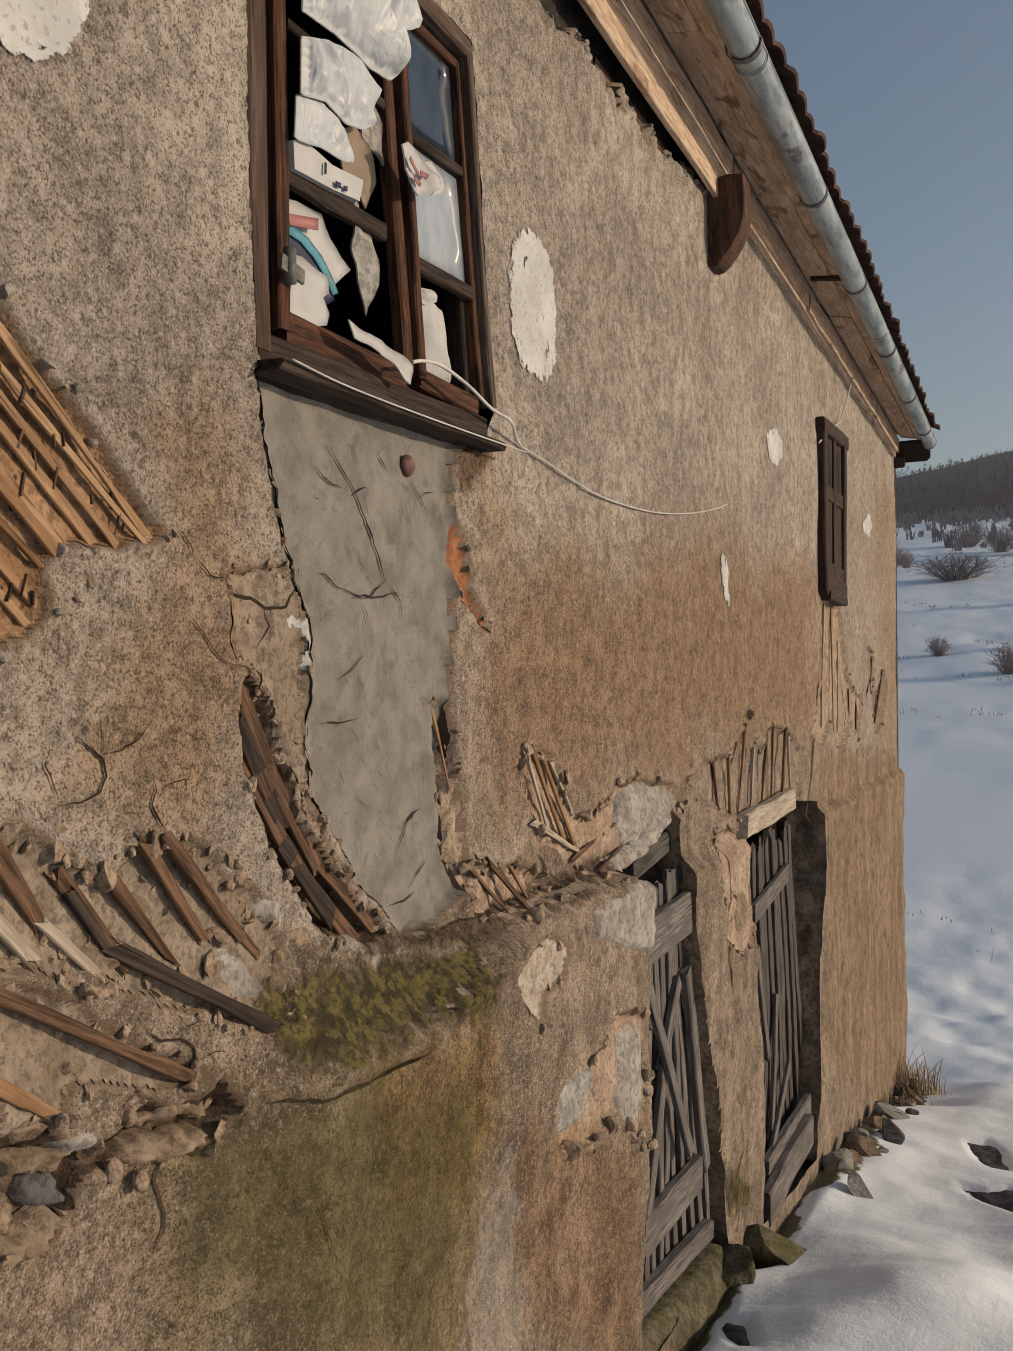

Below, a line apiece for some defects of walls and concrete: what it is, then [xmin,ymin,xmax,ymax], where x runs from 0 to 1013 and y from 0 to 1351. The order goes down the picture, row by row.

flaking render [539,0,709,195]
peeling [37,540,101,559]
crack [173,382,434,680]
flaking render [445,524,493,630]
flaking render [225,537,389,933]
crack [305,707,359,790]
peeling [578,770,664,822]
peeling [7,824,279,979]
flaking render [429,696,570,1034]
peeling [184,1000,255,1035]
peeling [81,1136,162,1192]
peeling [203,1119,226,1157]